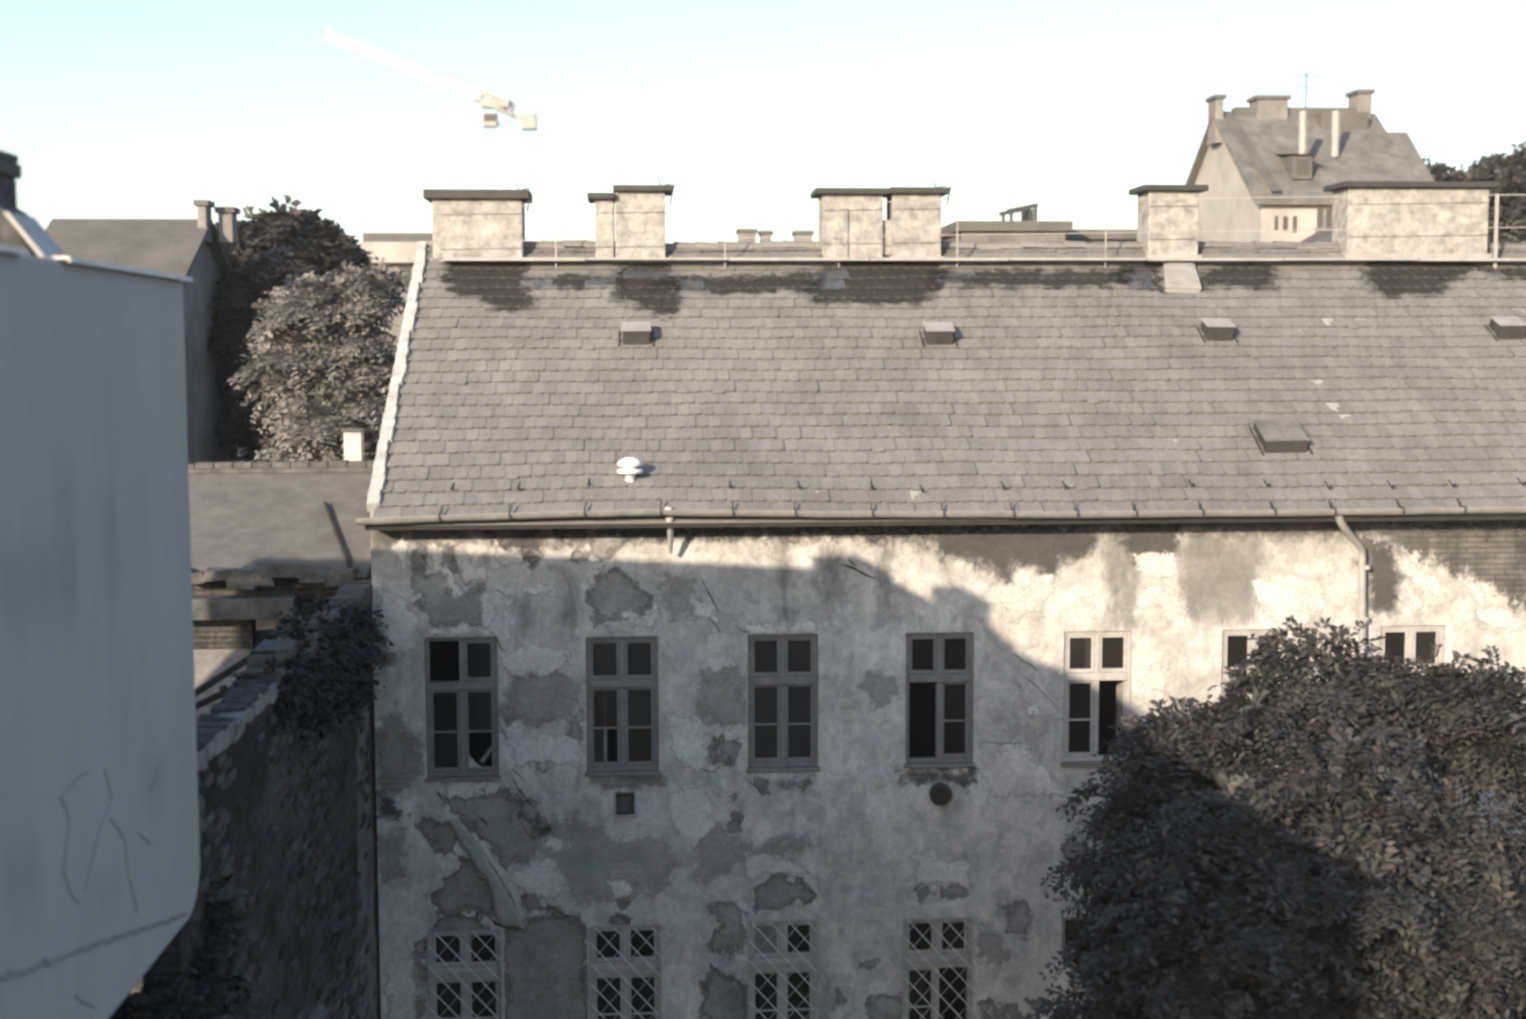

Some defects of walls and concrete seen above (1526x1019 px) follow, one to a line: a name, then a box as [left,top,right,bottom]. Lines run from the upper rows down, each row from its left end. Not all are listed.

damp [372,529,496,547]
spalling [364,529,560,670]
spalling [569,528,720,629]
peeling [741,620,818,634]
damp [529,520,1526,614]
peeling [999,569,1060,624]
peeling [1133,552,1191,637]
peeling [1250,572,1325,627]
peeling [896,738,1065,799]
spalling [334,644,818,1019]
peeling [910,851,971,903]
spalling [818,981,903,1019]